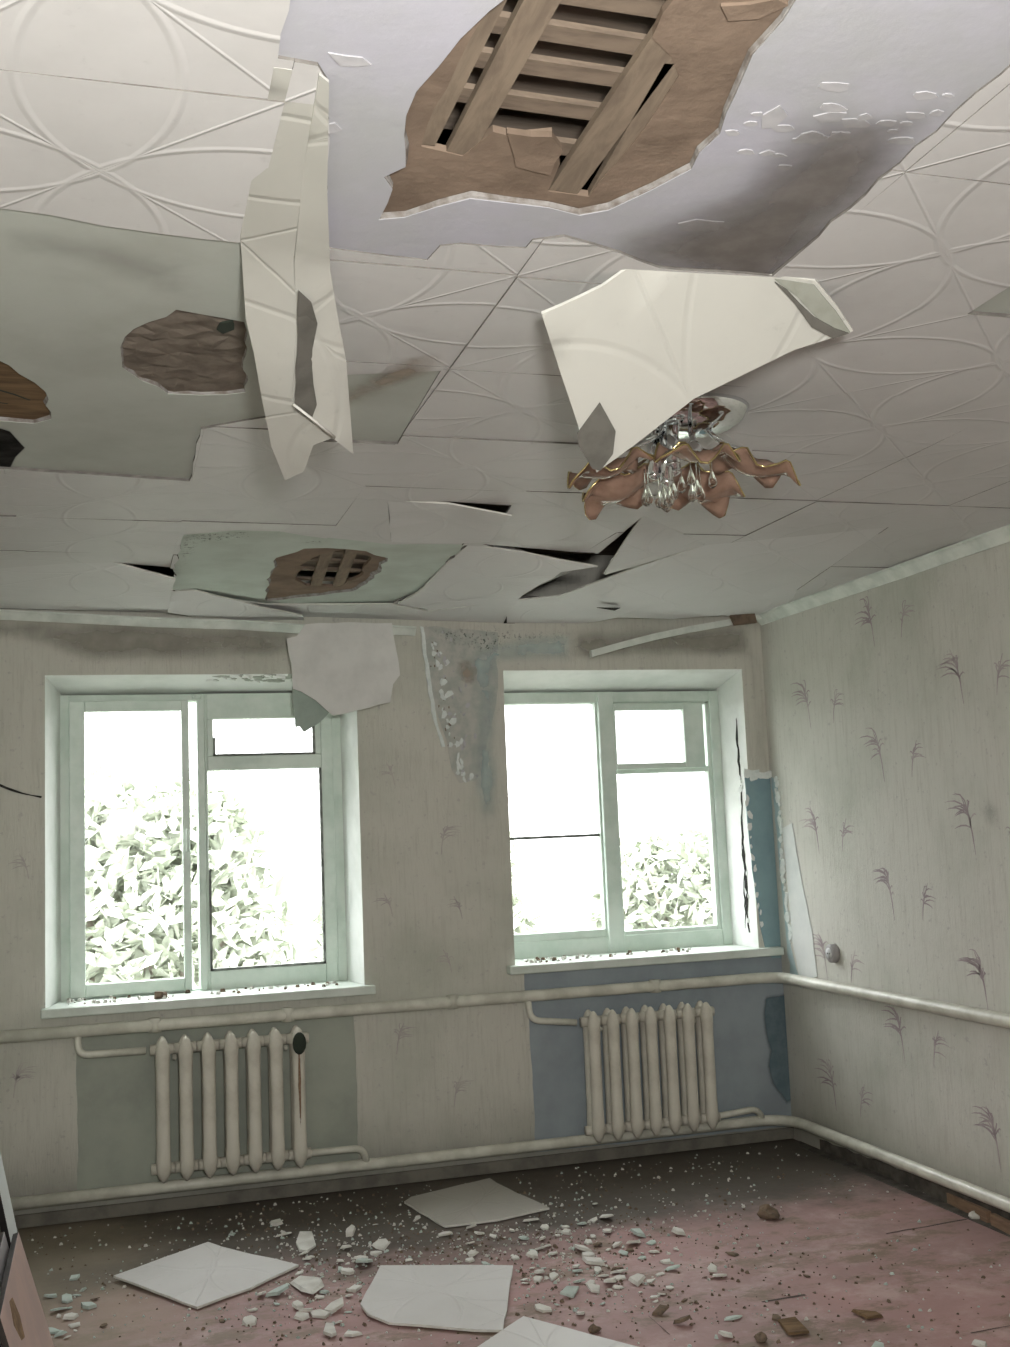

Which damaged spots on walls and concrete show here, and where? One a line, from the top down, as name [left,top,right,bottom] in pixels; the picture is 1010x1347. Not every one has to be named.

flaking render [278,0,1010,268]
damp [656,132,879,338]
flaking render [0,209,265,479]
flaking render [173,530,465,603]
crack [0,784,42,798]
flaking render [420,626,498,783]